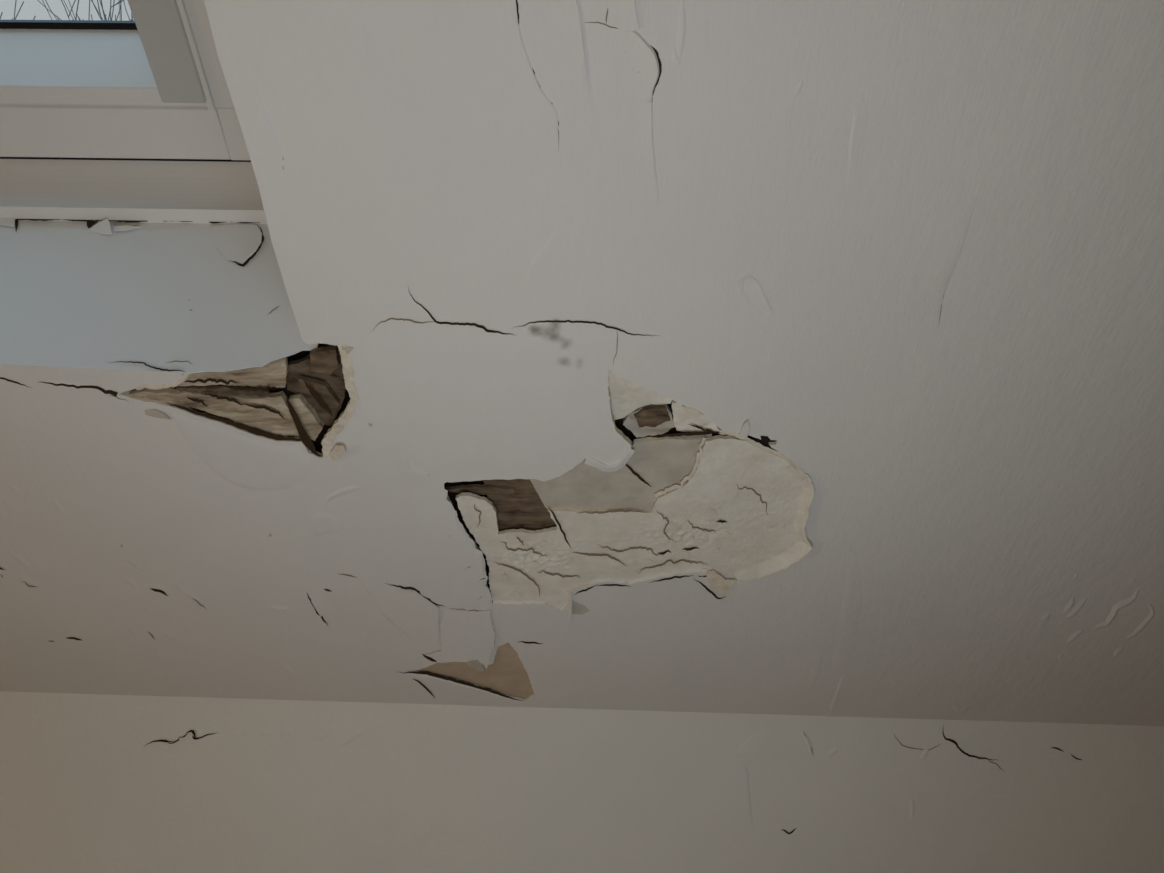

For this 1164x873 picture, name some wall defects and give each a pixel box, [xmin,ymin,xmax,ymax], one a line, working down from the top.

peeling [0,217,147,234]
peeling [209,222,264,267]
crack [374,287,657,362]
crack [0,360,194,406]
spalling [129,343,359,461]
spalling [341,370,815,707]
crack [138,730,221,762]
crack [894,722,1005,772]